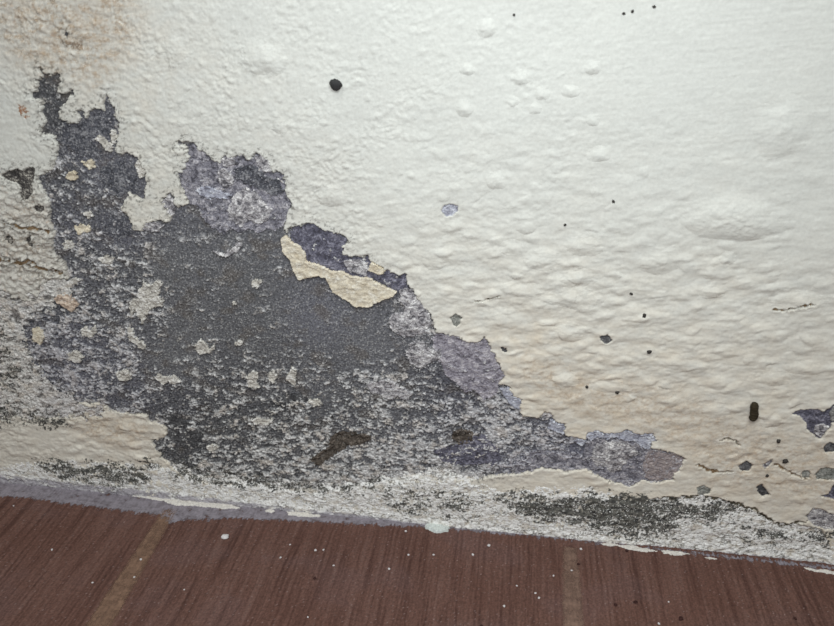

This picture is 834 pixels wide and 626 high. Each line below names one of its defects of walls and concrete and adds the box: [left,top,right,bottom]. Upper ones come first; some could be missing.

water stain [0,310,69,431]
peeling [0,68,834,565]
water stain [31,451,164,491]
water stain [171,457,834,557]